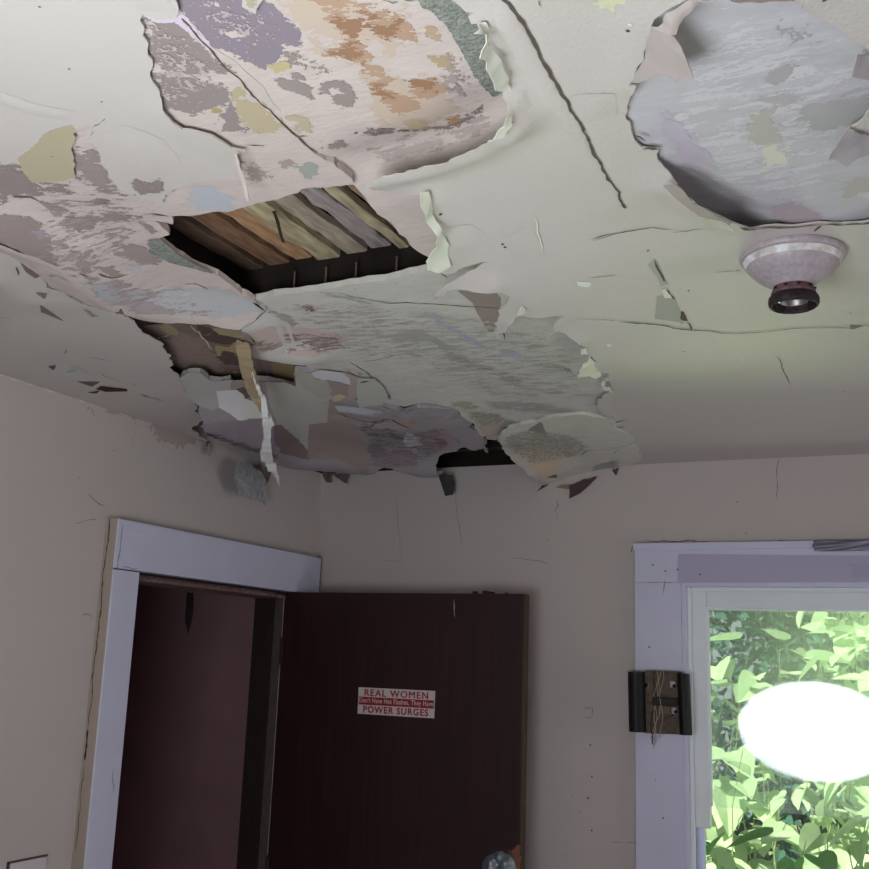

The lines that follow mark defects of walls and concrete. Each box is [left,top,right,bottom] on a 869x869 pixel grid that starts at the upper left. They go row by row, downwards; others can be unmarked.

crack [502,0,626,209]
flaking render [626,0,869,227]
flaking render [0,0,643,507]
crack [592,227,697,241]